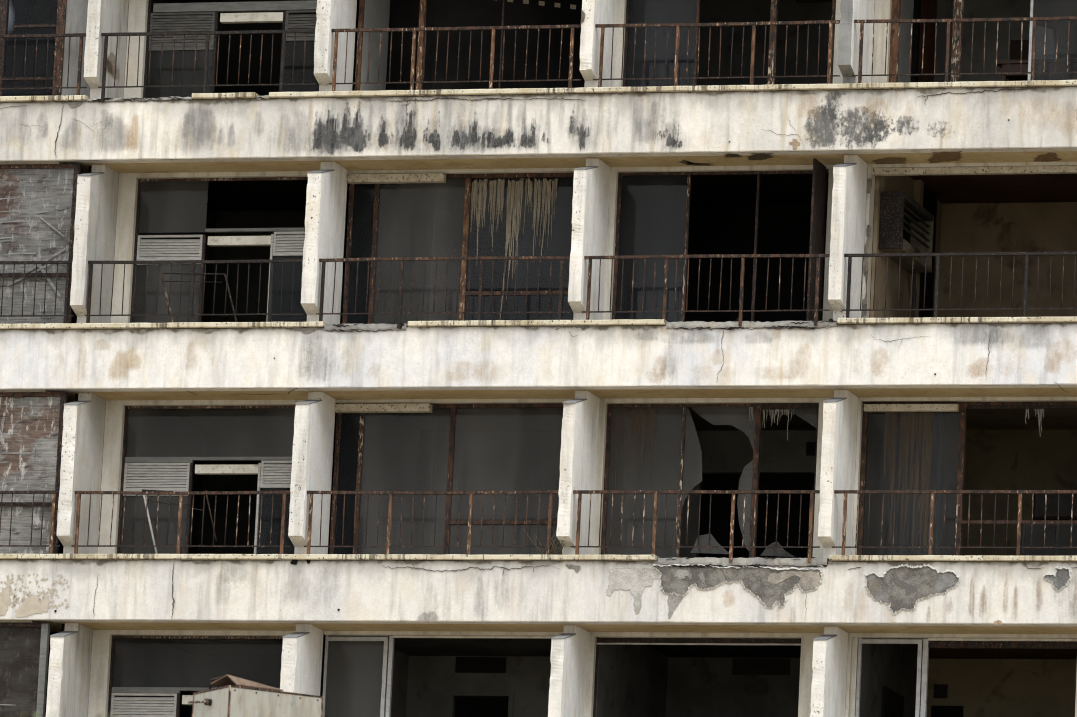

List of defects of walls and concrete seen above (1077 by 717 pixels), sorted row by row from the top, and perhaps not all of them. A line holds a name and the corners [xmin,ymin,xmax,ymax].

leakage [313,98,548,155]
leakage [569,111,589,150]
leakage [659,126,682,147]
leakage [805,91,919,148]
peeling [0,573,69,618]
flaking render [606,556,829,618]
flaking render [864,563,961,616]
flaking render [1043,566,1073,593]